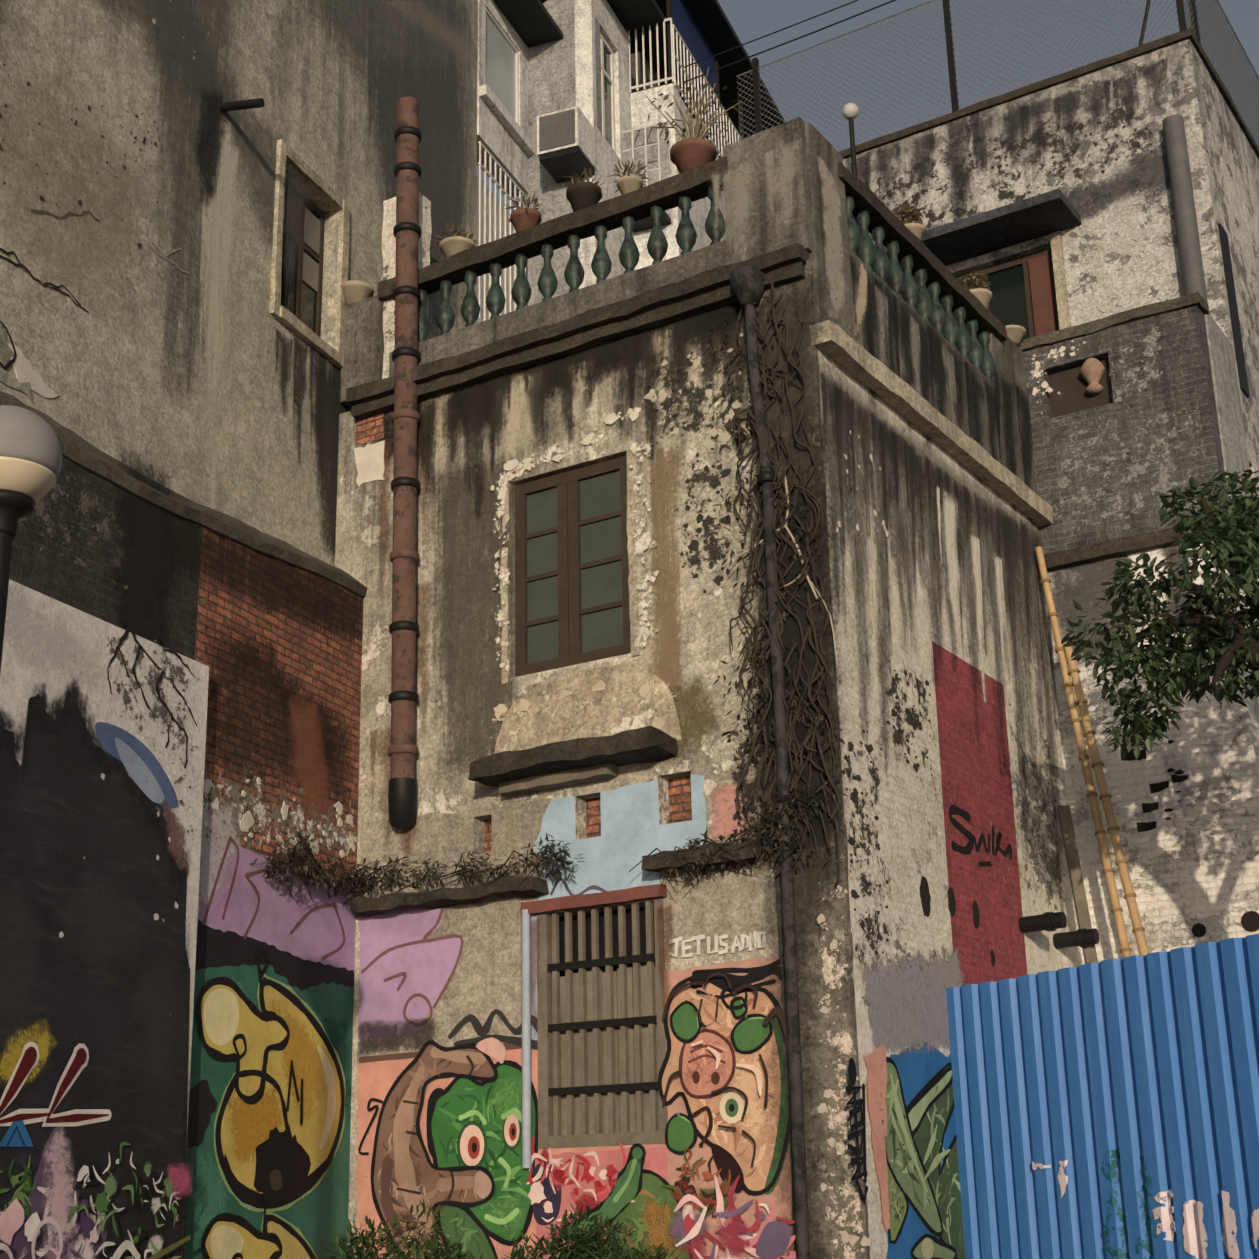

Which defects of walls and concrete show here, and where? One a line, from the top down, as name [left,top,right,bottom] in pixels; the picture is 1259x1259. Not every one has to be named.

spalling [0,321,59,403]
crack [0,248,89,313]
leakage [100,0,306,509]
leakage [850,256,1032,488]
leakage [925,59,1171,231]
crack [107,602,197,768]
peeling [490,690,573,750]
leakage [417,311,750,771]
peeling [490,329,751,671]
peeling [627,586,760,774]
leakage [821,374,1225,824]
peeling [814,655,948,1259]